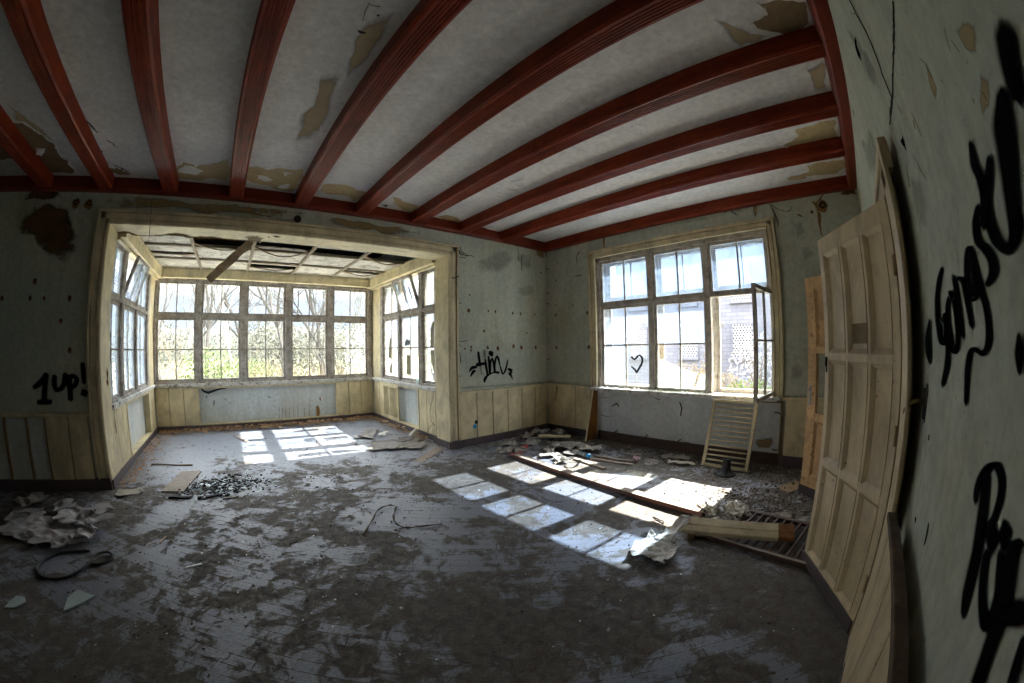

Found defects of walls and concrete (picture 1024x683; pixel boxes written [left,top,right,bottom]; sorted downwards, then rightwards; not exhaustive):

peeling [747,0,812,36]
crack [849,0,895,125]
peeling [12,121,76,175]
peeling [782,119,840,148]
peeling [176,158,231,183]
peeling [246,166,305,192]
peeling [318,183,367,202]
peeling [785,159,845,181]